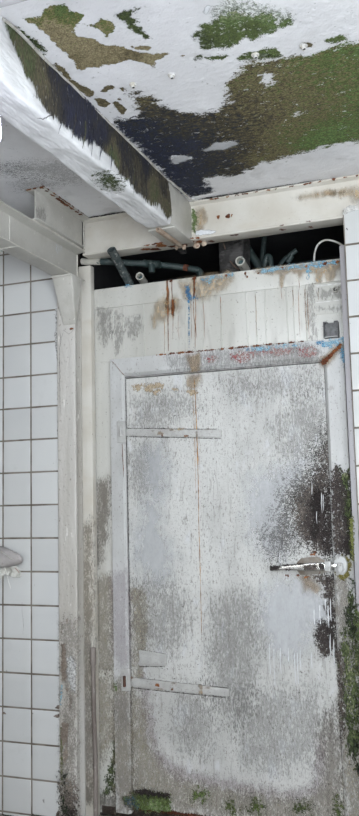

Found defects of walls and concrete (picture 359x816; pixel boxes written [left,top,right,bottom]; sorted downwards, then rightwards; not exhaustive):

peeling [23,4,168,115]
water stain [5,22,359,221]
corrosion [183,264,197,337]
corrosion [156,279,304,355]
corrosion [320,344,342,365]
water stain [96,479,111,565]
mould [257,419,354,565]
water stain [97,572,344,816]
mould [56,727,80,816]